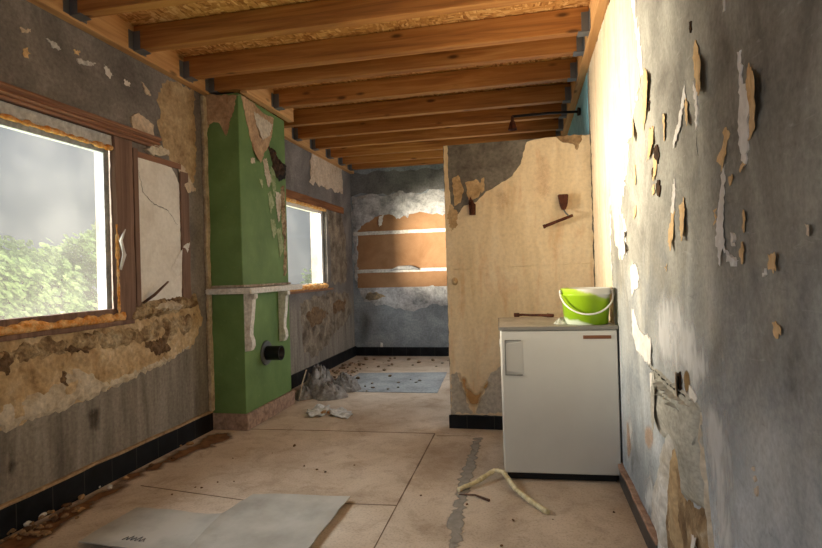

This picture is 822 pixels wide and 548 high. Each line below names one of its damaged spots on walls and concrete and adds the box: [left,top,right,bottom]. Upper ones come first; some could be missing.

peeling [73,49,113,79]
peeling [130,79,197,193]
peeling [251,146,287,277]
peeling [300,154,448,358]
peeling [630,263,640,296]
peeling [642,21,701,197]
peeling [713,50,756,267]
spalling [0,293,203,433]
peeling [450,366,502,414]
peeling [631,309,654,401]
spalling [651,433,709,548]